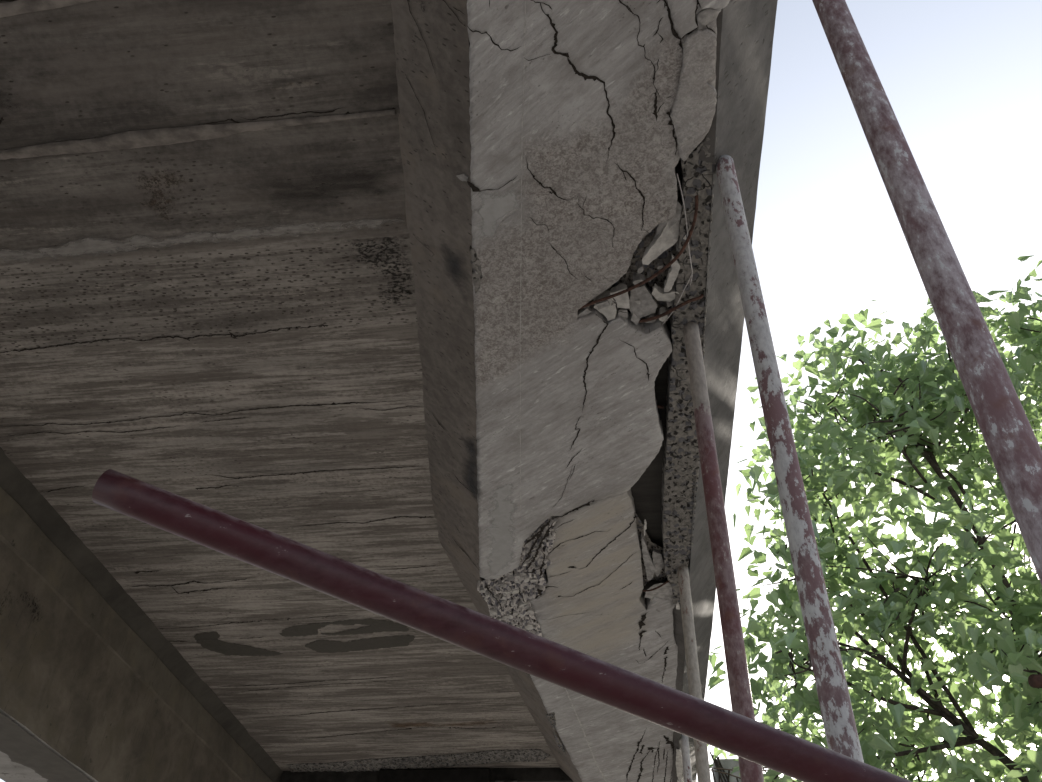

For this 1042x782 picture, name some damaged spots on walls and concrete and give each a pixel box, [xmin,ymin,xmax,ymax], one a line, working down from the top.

crack [619,0,715,155]
crack [525,216,591,281]
crack [0,323,340,353]
spalling [577,0,729,650]
crack [540,301,650,620]
spalling [477,516,557,637]
crack [626,728,672,782]